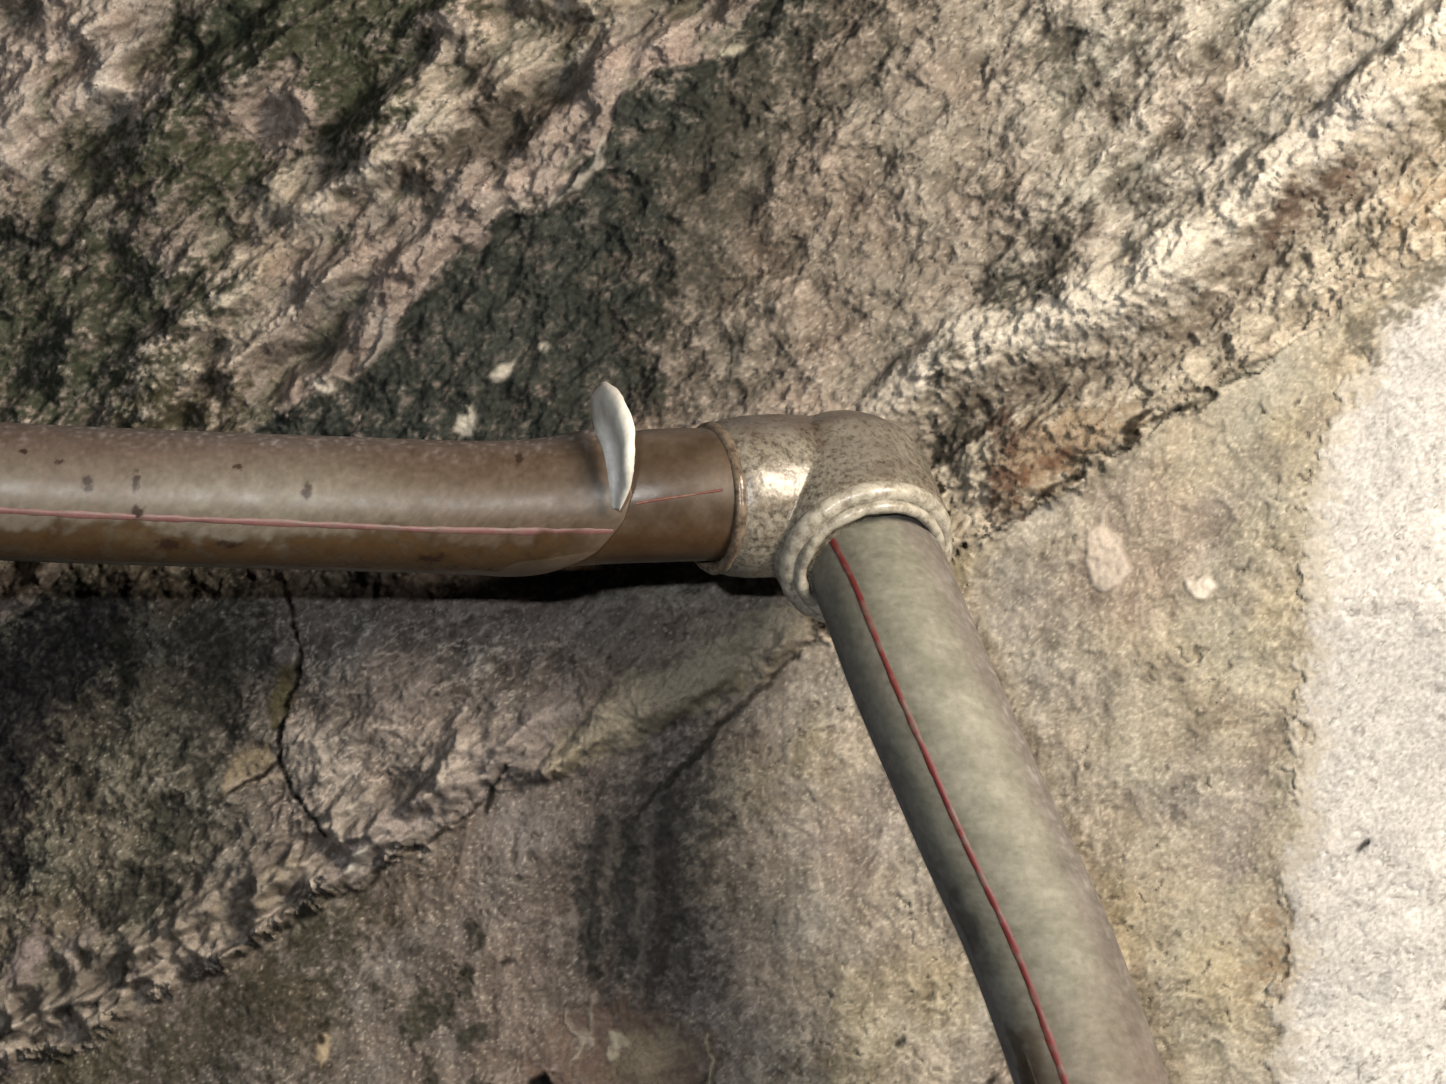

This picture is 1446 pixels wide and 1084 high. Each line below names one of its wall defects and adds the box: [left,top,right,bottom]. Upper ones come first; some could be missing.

crack [983,369,1264,538]
crack [228,582,327,859]